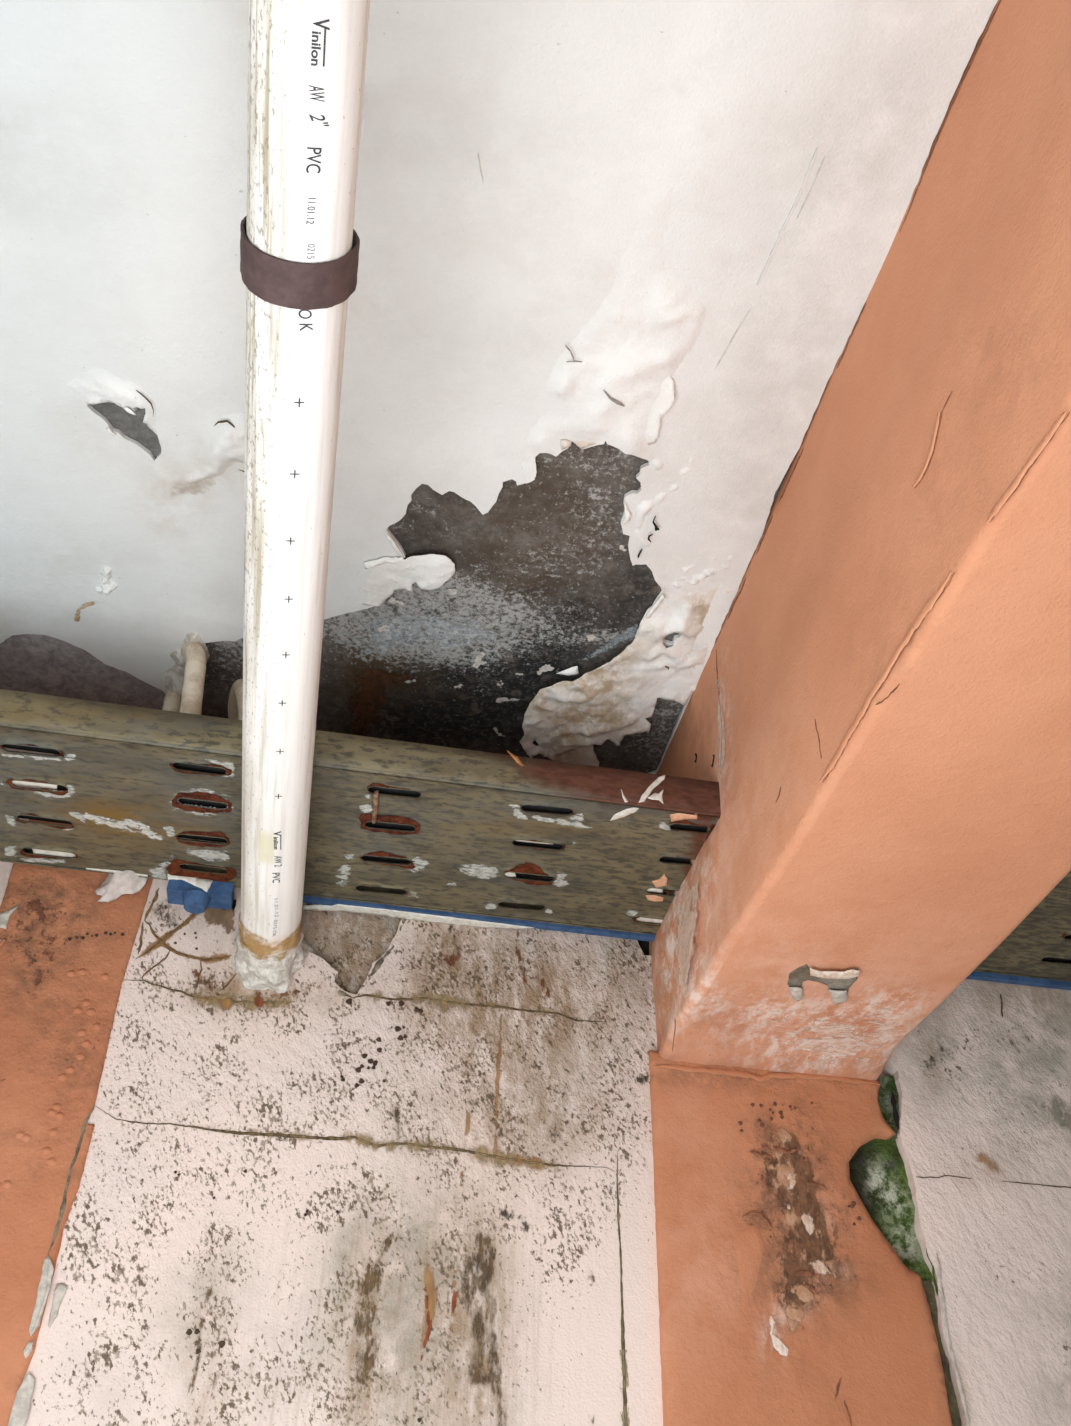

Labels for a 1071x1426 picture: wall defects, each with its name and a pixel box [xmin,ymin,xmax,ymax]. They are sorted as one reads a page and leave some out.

spalling [90,402,161,458]
spalling [316,439,739,773]
spalling [201,638,243,719]
crack [815,572,955,782]
corrosion [0,744,76,761]
corrosion [0,759,237,882]
corrosion [447,804,592,887]
leakage [154,904,302,960]
crack [346,992,603,1022]
leakage [340,1026,408,1088]
crack [48,1104,630,1426]
leakage [447,1233,502,1426]